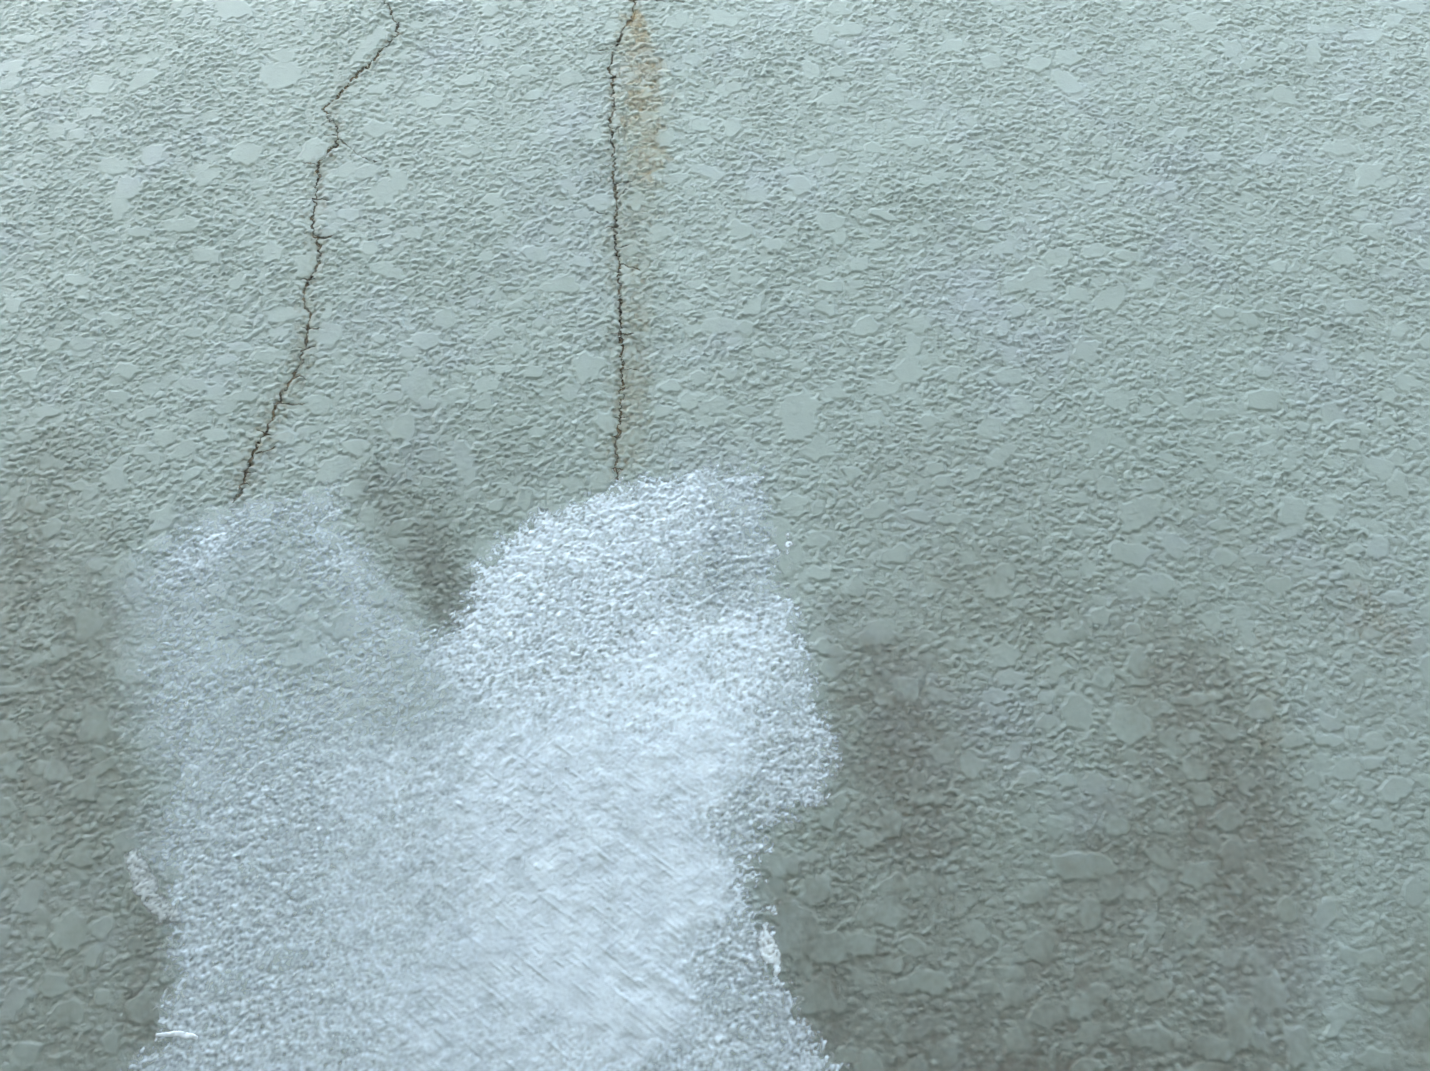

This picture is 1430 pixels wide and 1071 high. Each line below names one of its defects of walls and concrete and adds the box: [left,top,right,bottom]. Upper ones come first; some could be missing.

crack [232,0,400,503]
crack [596,0,685,480]